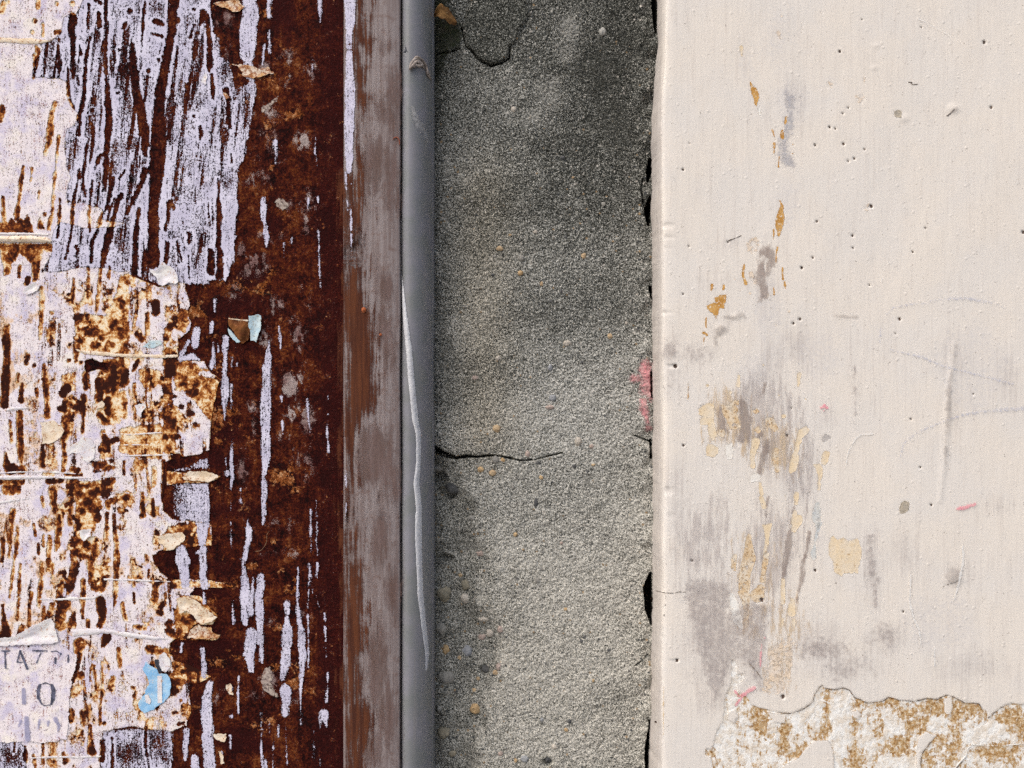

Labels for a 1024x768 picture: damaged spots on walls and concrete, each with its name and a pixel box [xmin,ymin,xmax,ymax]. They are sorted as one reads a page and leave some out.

peeling [0,0,284,768]
corrosion [334,0,401,768]
crack [435,447,560,461]
peeling [260,500,319,768]
peeling [313,672,329,732]
spalling [705,578,1024,768]